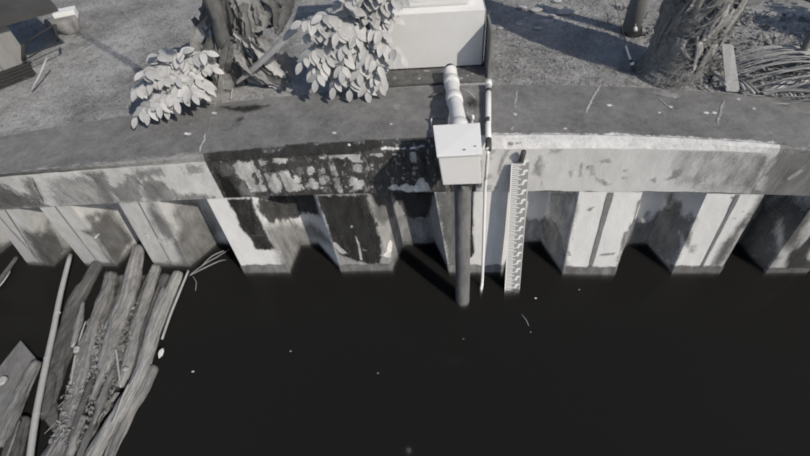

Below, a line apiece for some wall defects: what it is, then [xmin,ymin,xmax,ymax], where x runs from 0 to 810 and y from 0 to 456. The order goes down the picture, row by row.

leakage [0,168,216,265]
peeling [218,144,430,197]
leakage [626,151,810,282]